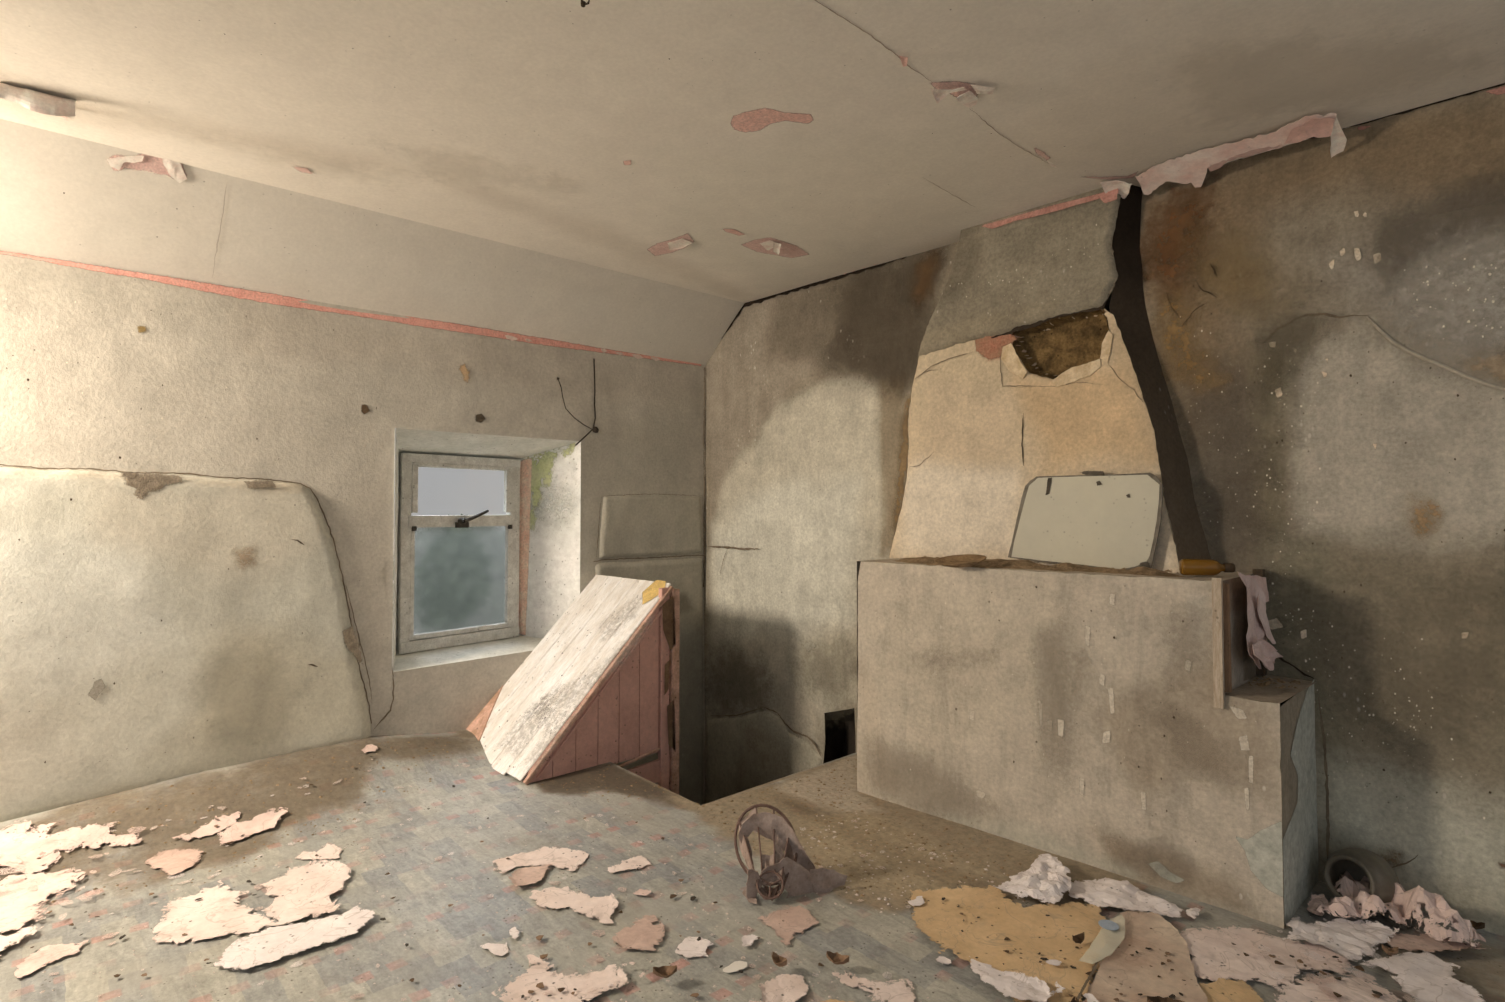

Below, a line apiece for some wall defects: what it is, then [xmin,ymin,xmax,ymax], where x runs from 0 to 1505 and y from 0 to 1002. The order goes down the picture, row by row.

crack [815,0,929,80]
peeling [731,108,813,132]
peeling [931,81,994,108]
crack [970,109,1049,164]
peeling [107,154,187,183]
peeling [723,229,808,258]
crack [1166,264,1217,327]
water stain [1382,186,1505,381]
flaking render [975,295,1113,387]